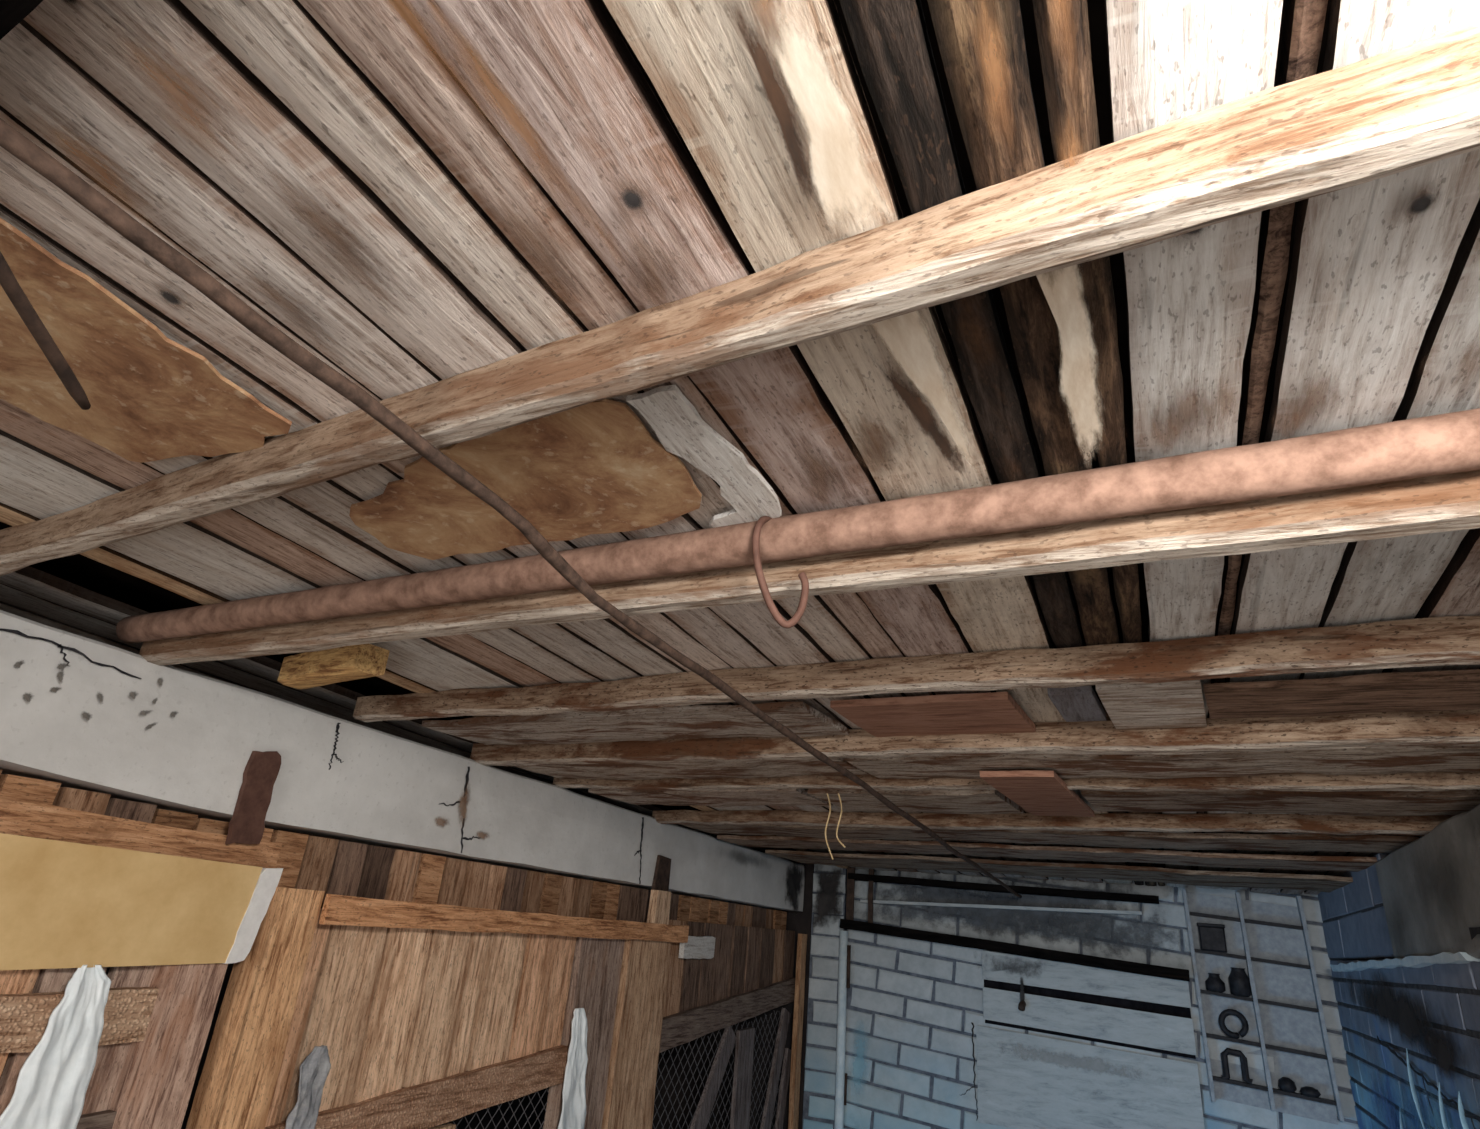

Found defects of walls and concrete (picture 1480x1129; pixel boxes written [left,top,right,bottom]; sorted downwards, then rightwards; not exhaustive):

crack [0,628,142,679]
crack [440,767,481,853]
crack [1469,927,1480,939]